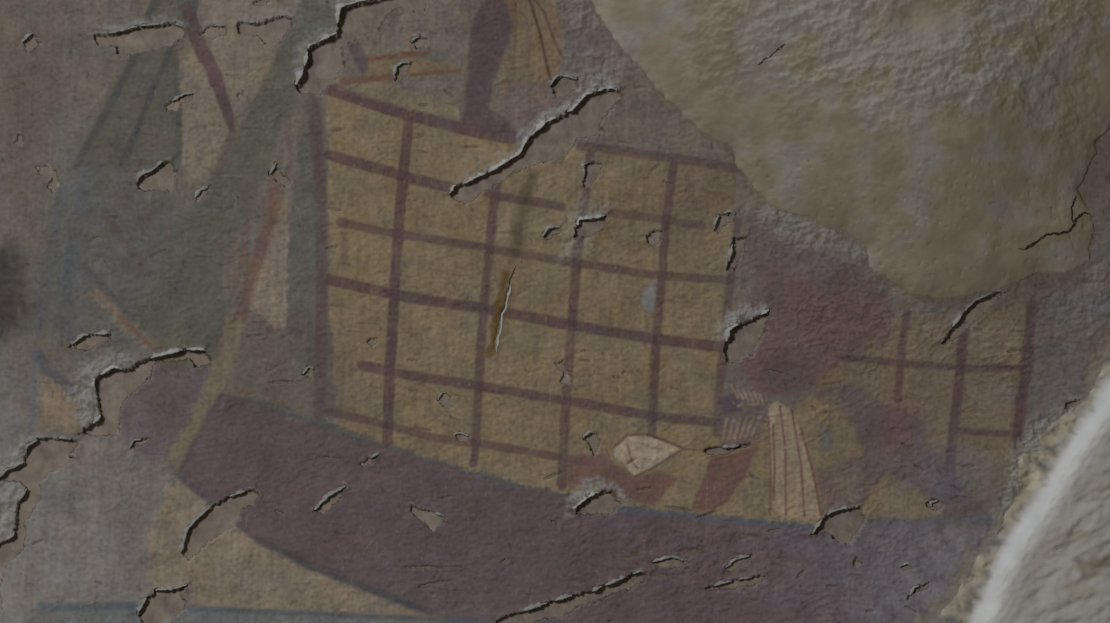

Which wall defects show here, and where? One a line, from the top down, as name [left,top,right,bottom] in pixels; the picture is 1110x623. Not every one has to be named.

flaking render [95,22,184,57]
flaking render [295,0,432,95]
flaking render [550,73,577,97]
flaking render [136,160,177,192]
crack [1019,197,1089,250]
flaking render [723,309,769,363]
flaking render [942,288,1005,343]
flaking render [0,347,210,587]
flaking render [179,490,258,559]
flaking render [572,491,619,515]
flaking render [811,505,863,543]
flaking render [136,584,187,623]